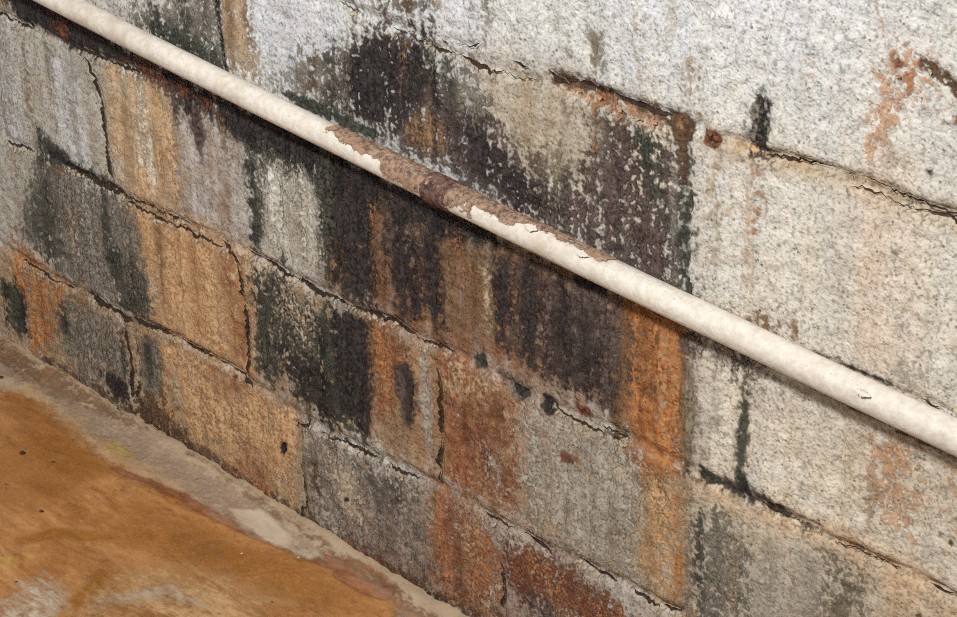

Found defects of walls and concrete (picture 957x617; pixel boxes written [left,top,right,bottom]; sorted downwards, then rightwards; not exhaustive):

rust [9,59,640,617]
leakage [0,0,699,617]
rust [616,298,694,617]
crack [767,152,957,228]
rust [864,41,956,177]